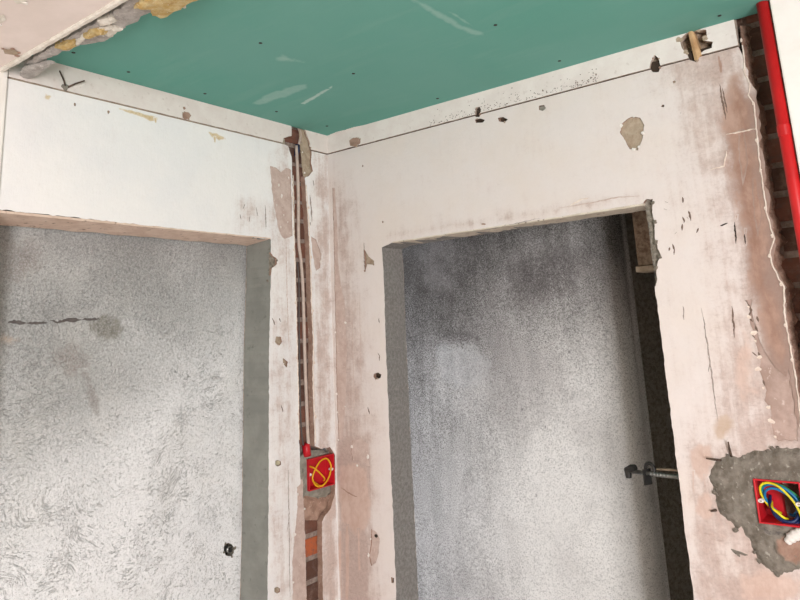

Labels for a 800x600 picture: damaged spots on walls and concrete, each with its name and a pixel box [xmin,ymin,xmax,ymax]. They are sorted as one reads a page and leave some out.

peeling [97,13,123,37]
spalling [676,29,712,62]
flaking render [620,116,645,151]
spalling [645,200,675,284]
flaking render [270,127,322,446]
crack [8,317,100,325]
crack [683,307,718,420]